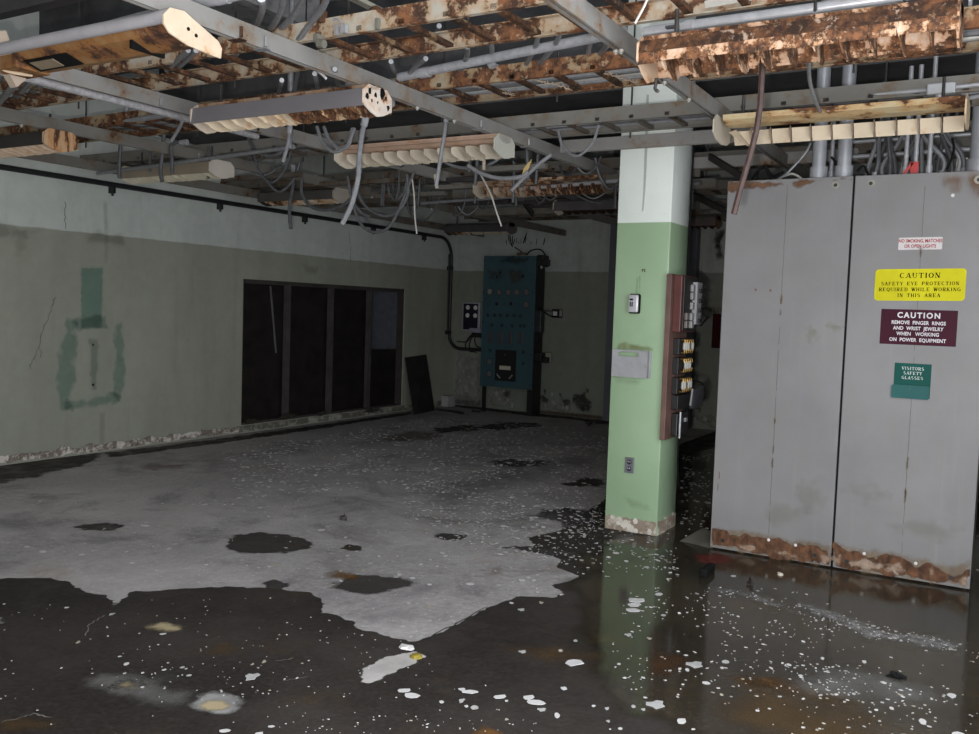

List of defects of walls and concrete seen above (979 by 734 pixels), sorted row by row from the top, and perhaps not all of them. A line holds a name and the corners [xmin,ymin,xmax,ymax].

leakage [675,431,716,514]
flaking render [605,512,676,536]
leakage [0,478,699,734]